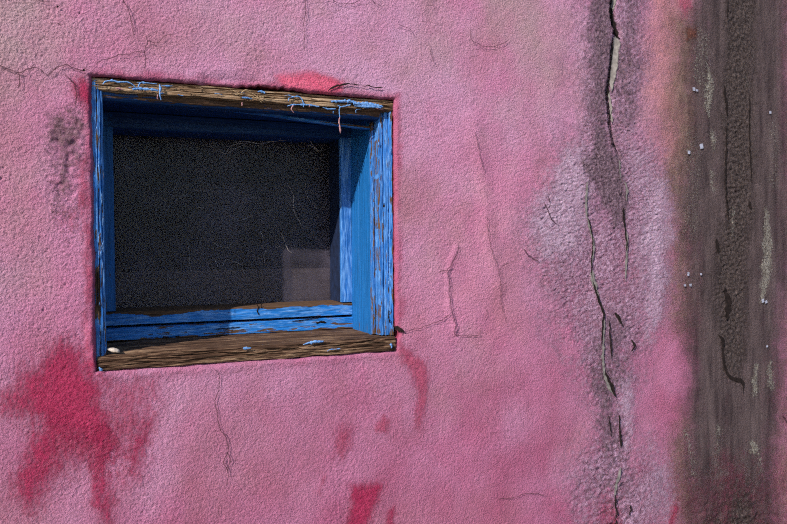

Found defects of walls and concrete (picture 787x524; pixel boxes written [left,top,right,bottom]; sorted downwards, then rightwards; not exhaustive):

crack [0,0,172,104]
crack [328,83,383,91]
leakage [48,110,86,200]
crack [607,0,629,281]
crack [585,182,636,446]
leakage [666,0,787,524]
crack [614,467,632,524]